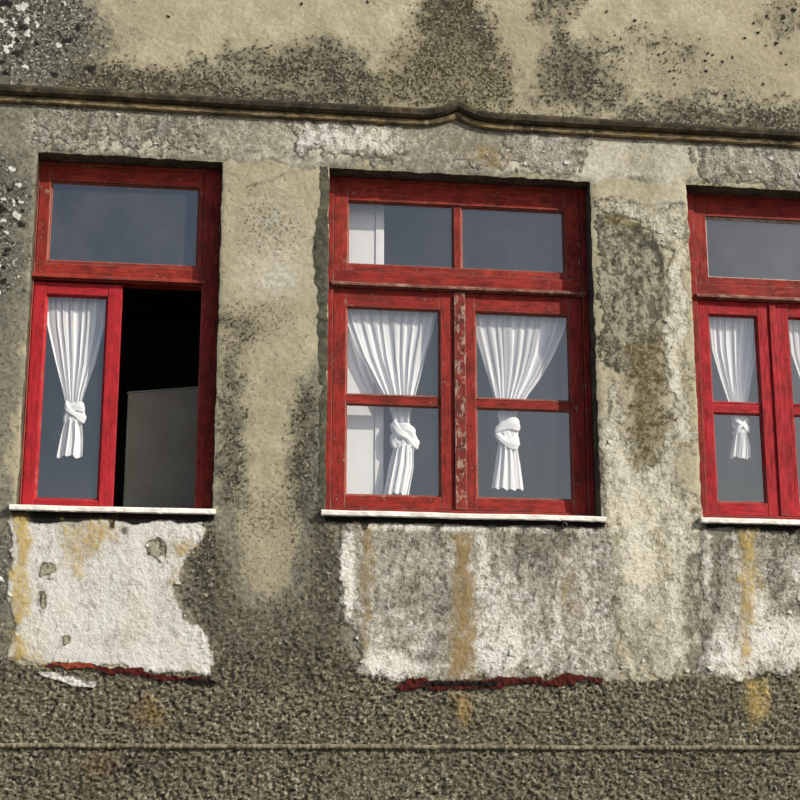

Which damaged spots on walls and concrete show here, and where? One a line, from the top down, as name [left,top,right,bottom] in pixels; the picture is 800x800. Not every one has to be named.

mould [0,0,800,148]
peeling [335,193,800,684]
peeling [6,516,214,688]
rust [450,534,476,676]
rust [740,533,756,666]
rust [747,680,770,719]